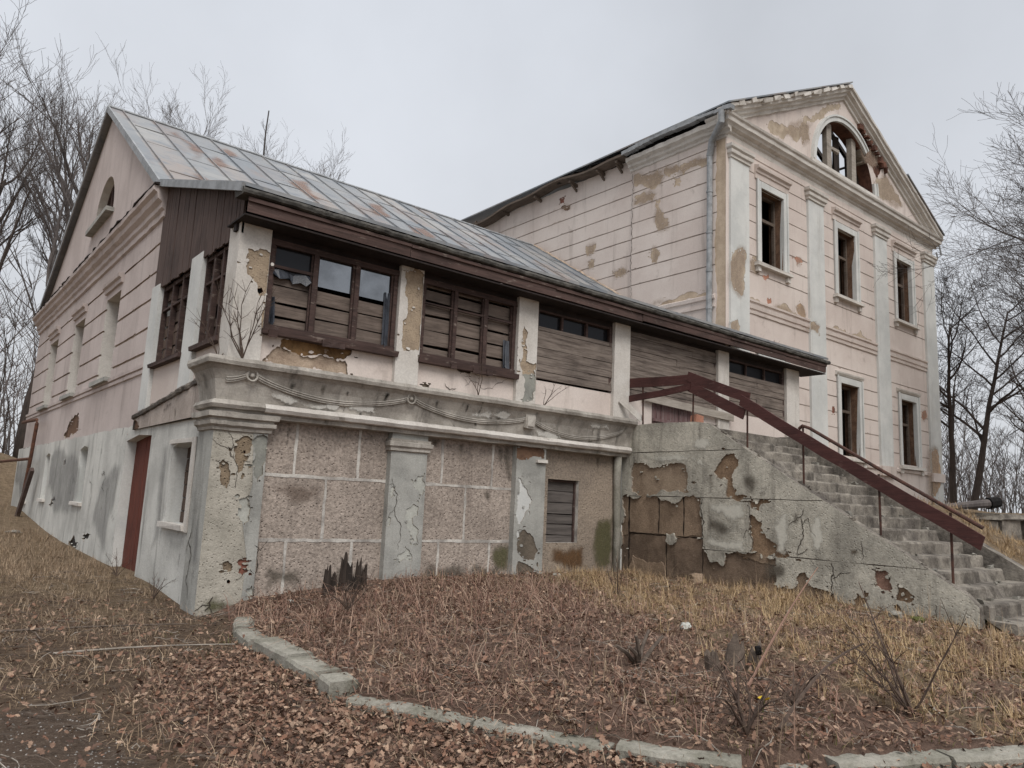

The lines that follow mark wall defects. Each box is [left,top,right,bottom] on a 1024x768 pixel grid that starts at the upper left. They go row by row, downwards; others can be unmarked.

peeling [634,153,707,231]
spalling [237,248,274,336]
peeling [731,247,820,335]
spalling [262,338,358,375]
spalling [517,327,538,402]
spalling [64,413,79,439]
spalling [216,435,268,525]
spalling [514,477,540,574]
spalling [620,447,835,601]
crack [788,509,816,556]
spalling [219,557,253,599]
spalling [849,567,915,612]